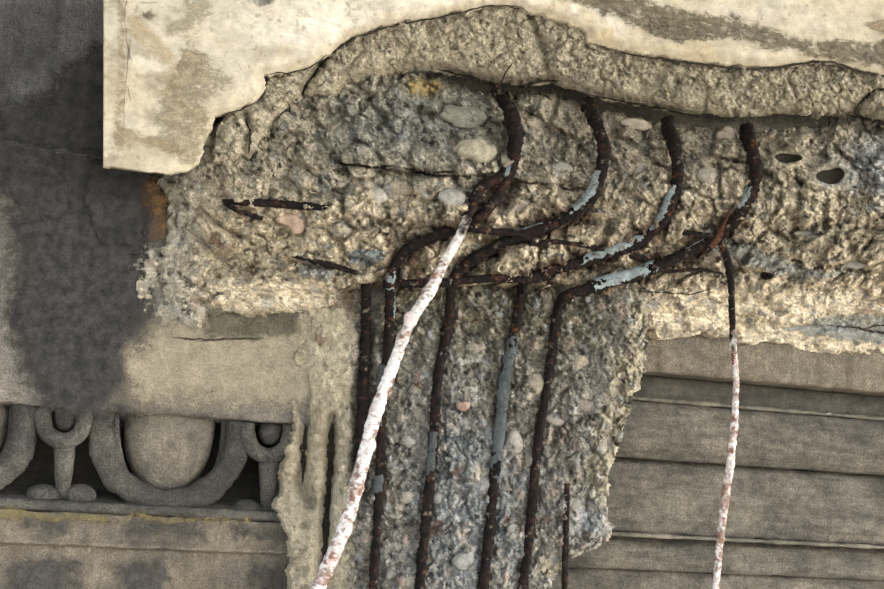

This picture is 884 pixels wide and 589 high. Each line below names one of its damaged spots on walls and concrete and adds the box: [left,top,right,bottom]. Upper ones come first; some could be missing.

leakage [572,0,884,67]
flaking render [867,20,884,32]
corrosion [141,176,171,240]
spalling [124,71,884,589]